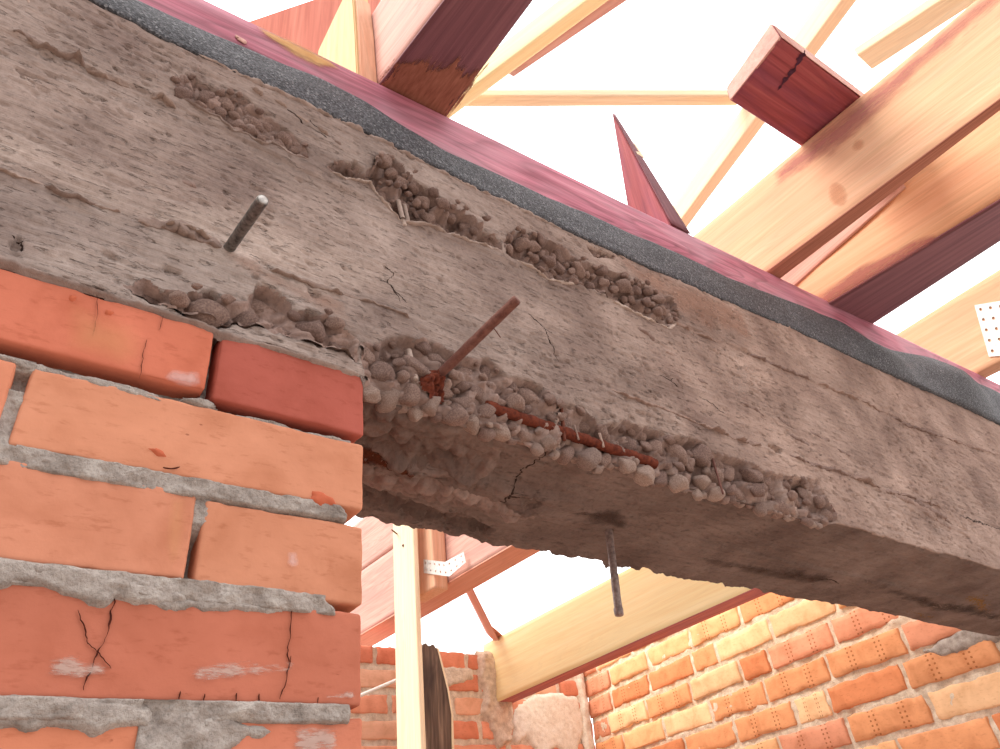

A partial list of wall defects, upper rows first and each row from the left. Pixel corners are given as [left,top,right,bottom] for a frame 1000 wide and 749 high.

peeling [317,284,411,318]
rust [419,296,520,404]
peeling [704,426,762,446]
crack [500,452,547,503]
spalling [362,483,485,534]
crack [78,598,116,690]
crack [235,611,292,701]